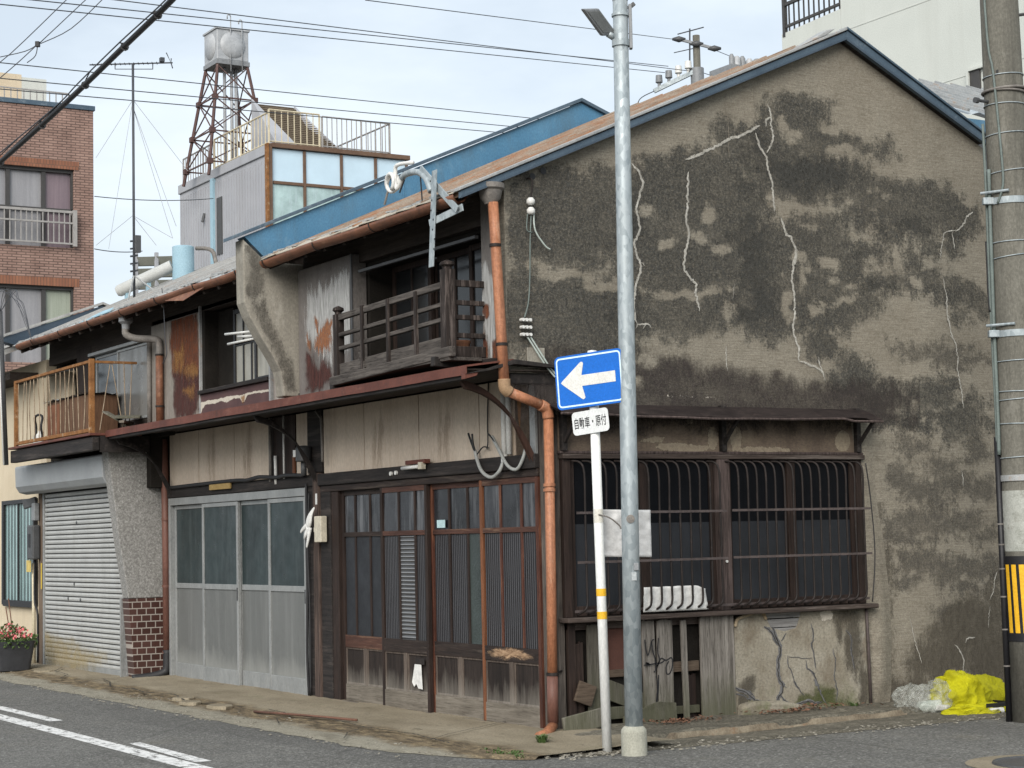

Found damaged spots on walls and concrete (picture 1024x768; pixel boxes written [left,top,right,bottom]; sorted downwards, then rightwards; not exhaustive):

corrosion [169,313,199,417]
peeling [201,389,269,412]
corrosion [305,317,332,393]
peeling [304,268,350,366]
damp [505,159,618,418]
damp [606,403,620,432]
crack [631,163,651,328]
crack [682,86,825,379]
damp [631,91,1004,705]
crack [940,212,973,408]
crack [736,625,855,704]